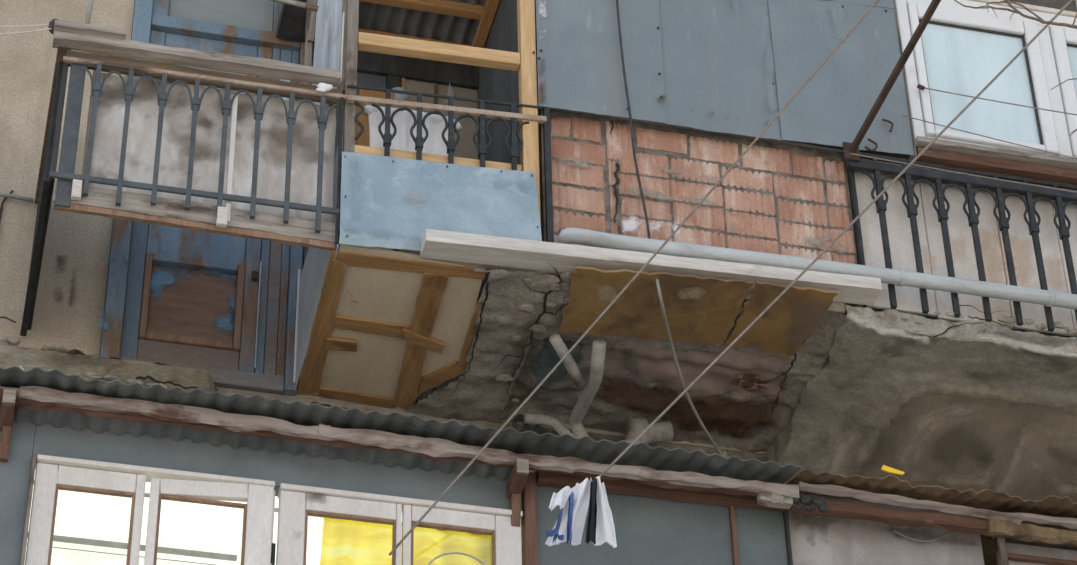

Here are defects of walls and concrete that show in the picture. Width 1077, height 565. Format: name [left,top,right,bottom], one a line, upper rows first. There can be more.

crack [612,163,620,233]
peeling [150,264,233,297]
crack [455,263,573,411]
peeling [511,269,582,388]
flaking render [845,307,929,341]
flaking render [979,336,1077,356]
crack [136,375,204,391]
flaking render [610,343,786,397]
water stain [899,380,1077,414]